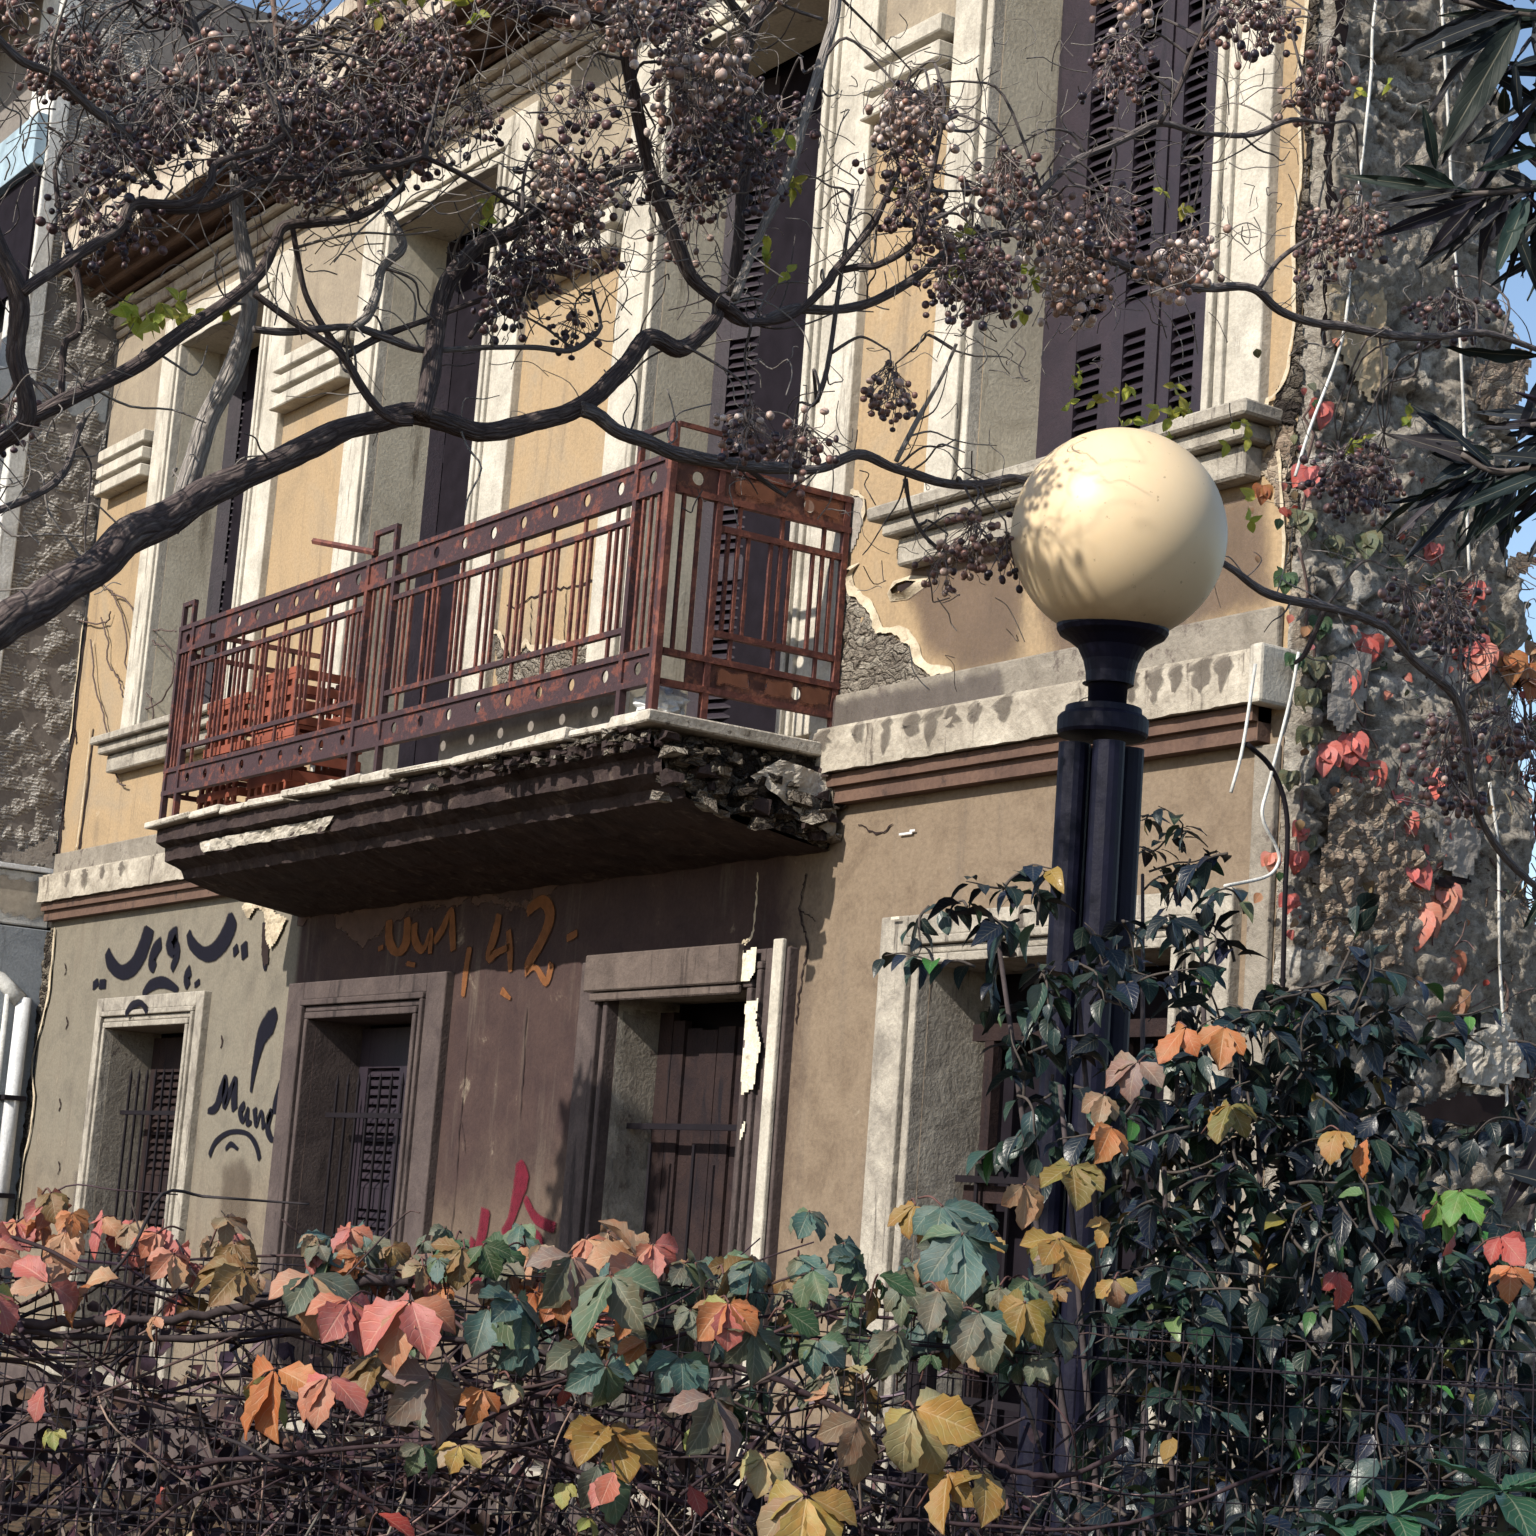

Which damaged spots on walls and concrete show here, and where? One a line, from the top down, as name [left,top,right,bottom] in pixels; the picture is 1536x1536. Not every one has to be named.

flaking render [1258,0,1320,572]
spalling [1469,347,1532,423]
corrosion [736,479,776,504]
corrosion [804,496,841,520]
flaking render [838,488,953,695]
corrosion [717,669,830,705]
damp [1127,653,1231,702]
spalling [383,726,846,844]
crack [742,872,758,945]
peeling [741,947,757,981]
crack [795,874,815,1025]
peeling [741,998,761,1095]